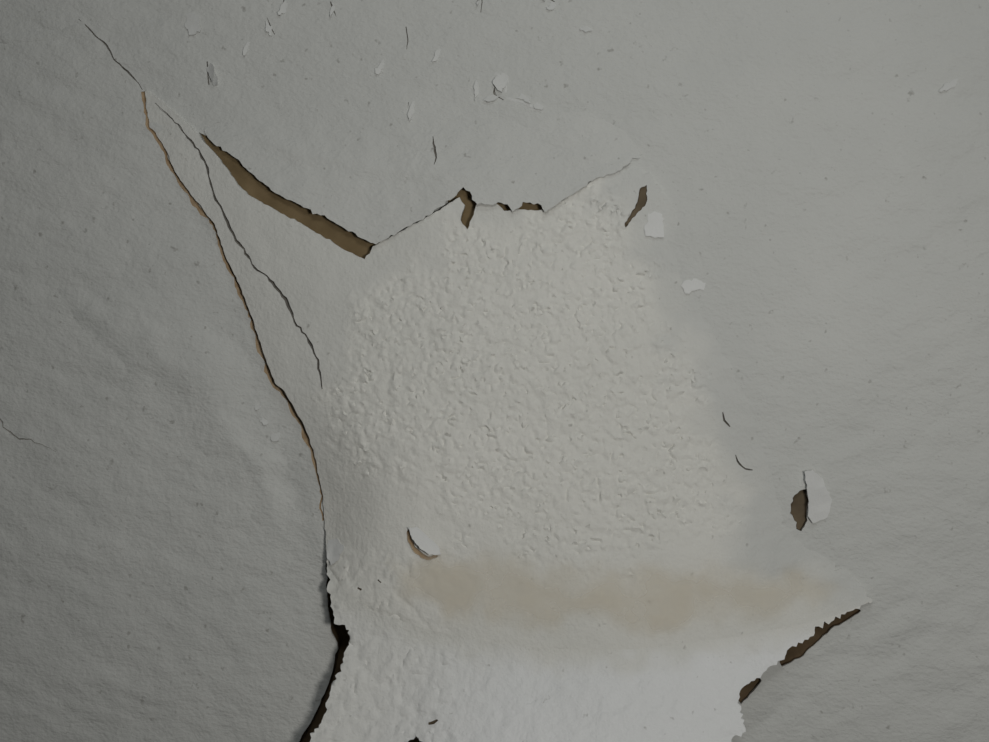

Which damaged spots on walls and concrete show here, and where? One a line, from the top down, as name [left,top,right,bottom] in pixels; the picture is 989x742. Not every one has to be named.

crack [0,419,56,452]
crack [80,20,324,521]
flaking render [145,72,872,742]